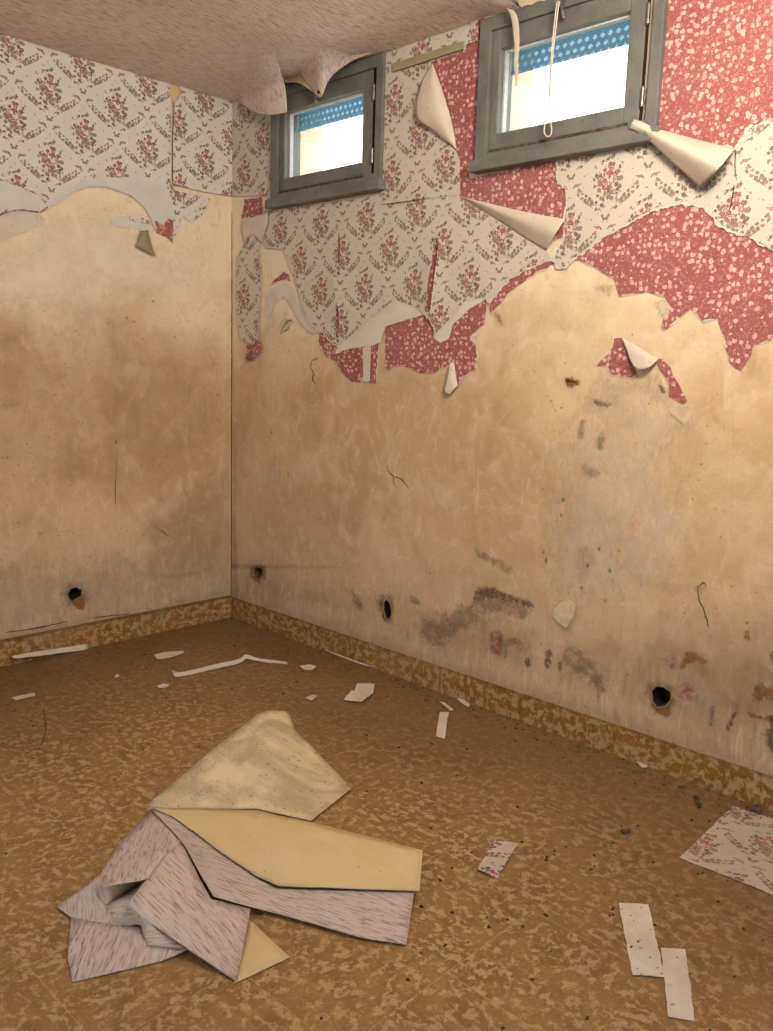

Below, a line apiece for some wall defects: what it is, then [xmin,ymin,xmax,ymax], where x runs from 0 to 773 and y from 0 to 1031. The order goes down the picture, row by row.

water stain [474,588,531,607]